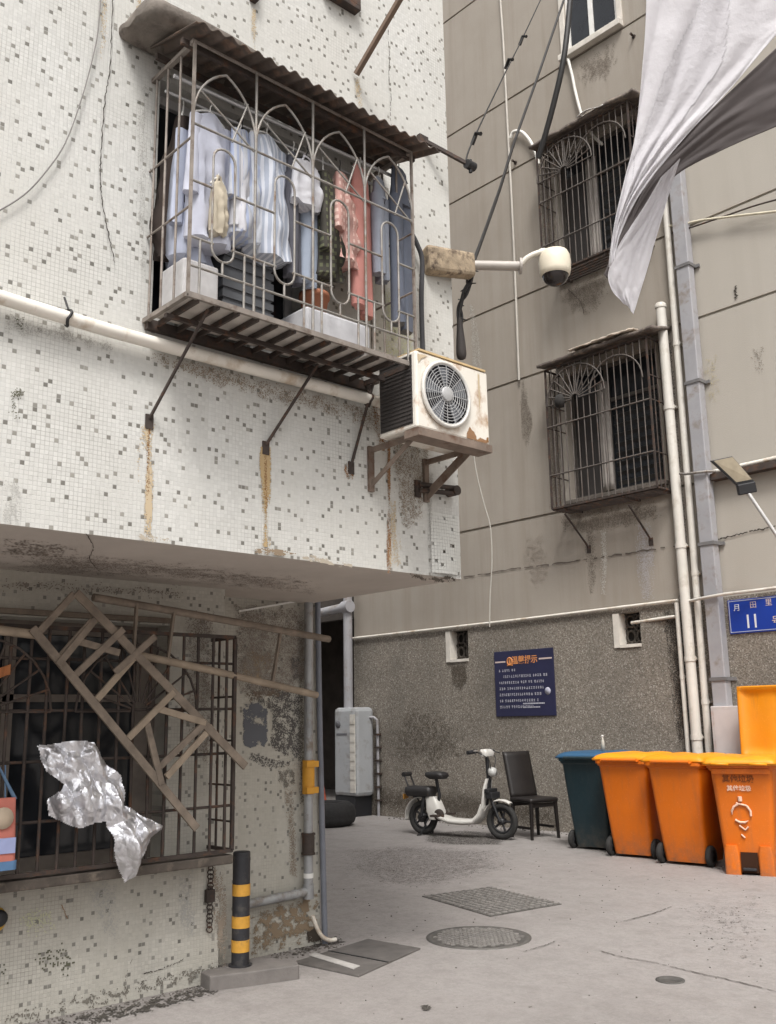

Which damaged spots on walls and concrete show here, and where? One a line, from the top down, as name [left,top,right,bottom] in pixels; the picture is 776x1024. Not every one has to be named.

crack [99,0,114,260]
corrosion [137,424,155,535]
corrosion [259,446,271,548]
water stain [151,353,434,576]
corrosion [386,447,402,574]
water stain [546,374,661,600]
peeling [246,683,304,768]
spalling [307,928,321,943]